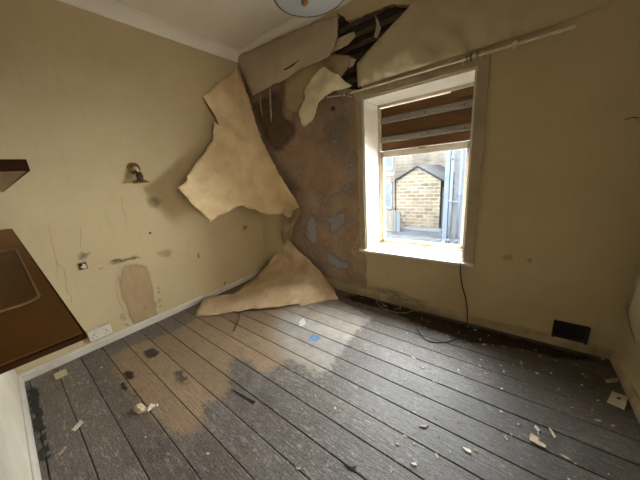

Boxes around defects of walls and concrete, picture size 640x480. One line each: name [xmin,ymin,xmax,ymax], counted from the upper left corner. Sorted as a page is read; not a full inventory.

flaking render [242,7,407,287]
peeling [116,265,156,323]